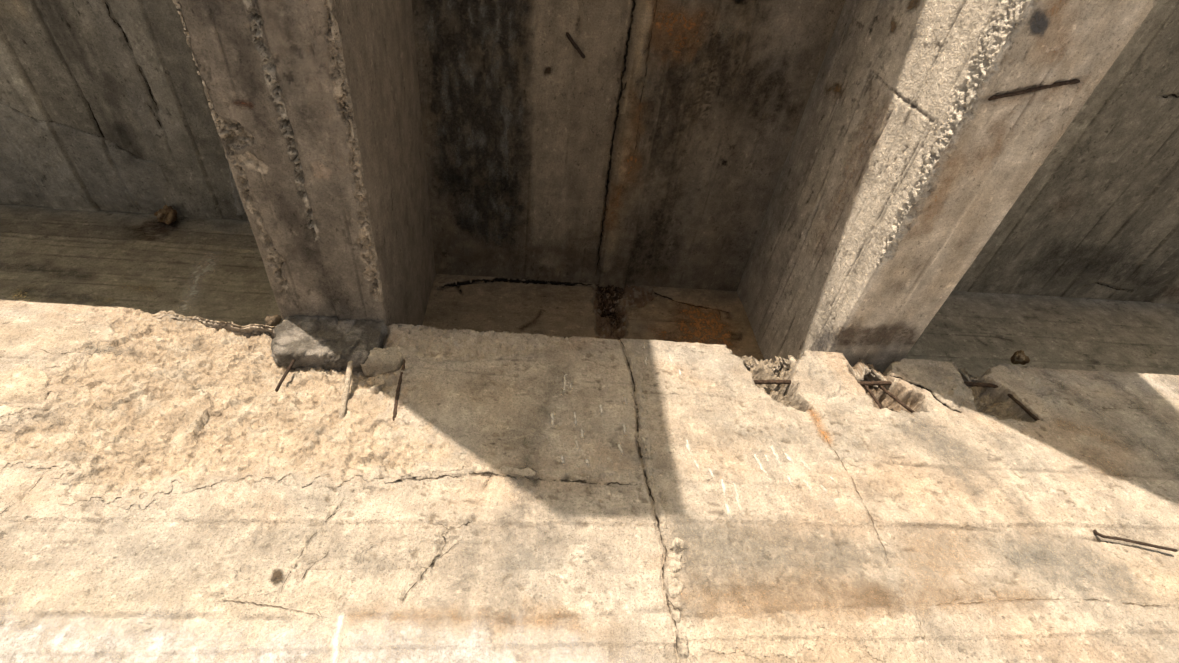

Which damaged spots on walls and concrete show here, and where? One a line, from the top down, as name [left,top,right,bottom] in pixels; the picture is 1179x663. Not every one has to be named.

spalling [323,0,384,303]
leakage [422,0,529,245]
crack [441,0,657,293]
spalling [591,283,658,340]
crack [631,287,729,318]
corrosion [653,304,735,348]
spalling [0,307,574,510]
spalling [724,344,814,412]
spalling [841,353,930,414]
spalling [952,362,1046,423]
crack [397,339,689,660]